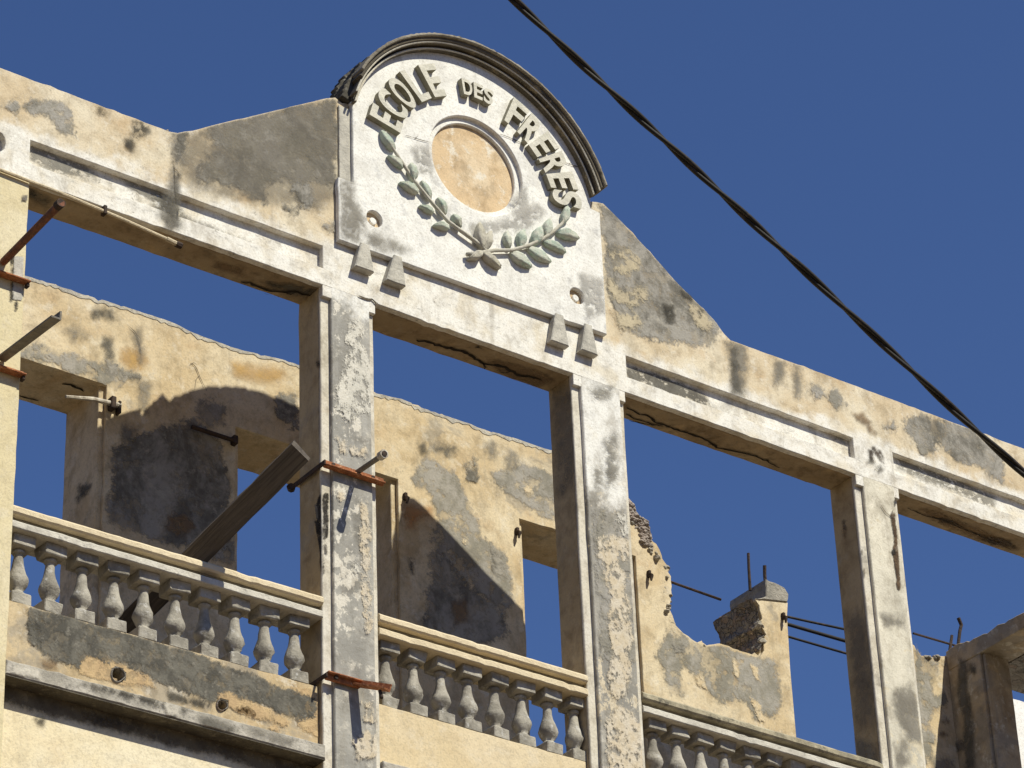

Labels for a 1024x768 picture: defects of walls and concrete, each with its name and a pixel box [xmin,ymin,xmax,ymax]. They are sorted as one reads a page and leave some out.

peeling [334,319,371,422]
crack [416,340,542,381]
water stain [627,367,707,405]
water stain [727,342,747,393]
water stain [775,361,800,395]
peeling [335,437,367,458]
crack [626,408,779,468]
spalling [315,490,345,574]
peeling [352,501,375,634]
peeling [592,506,643,768]
water stain [26,607,317,730]
peeling [352,701,377,763]